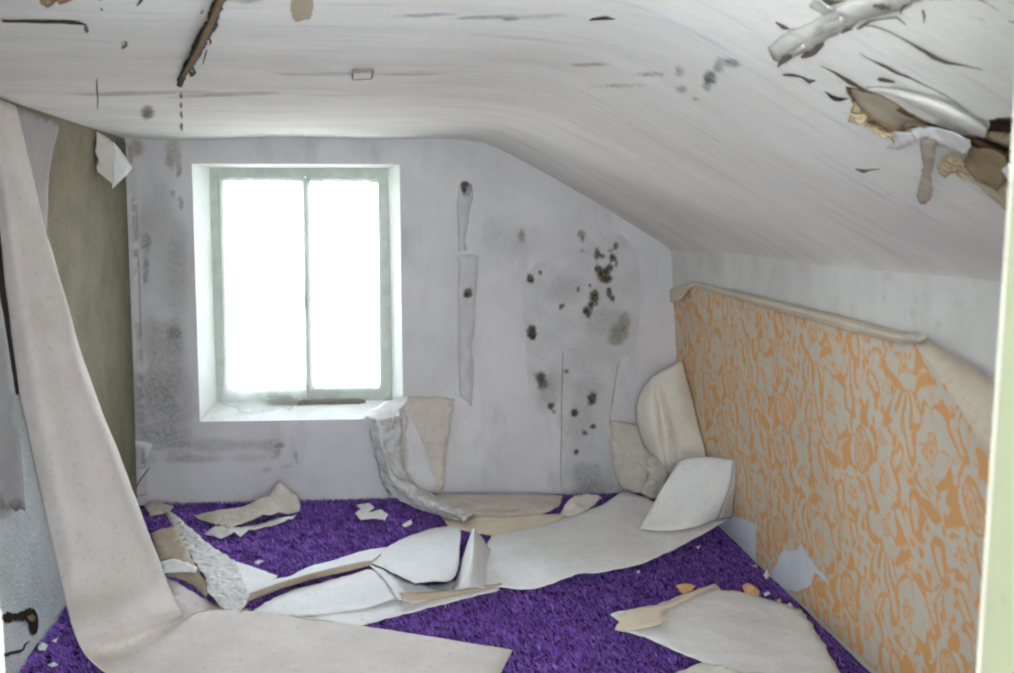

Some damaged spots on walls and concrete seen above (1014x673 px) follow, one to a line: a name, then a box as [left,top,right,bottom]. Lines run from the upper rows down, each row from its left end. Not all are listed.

peeling [291,0,314,22]
peeling [768,0,931,67]
spalling [845,86,1013,144]
peeling [95,131,147,497]
peeling [457,180,479,406]
water stain [577,244,618,317]
peeling [770,545,828,591]
spalling [1,607,39,635]